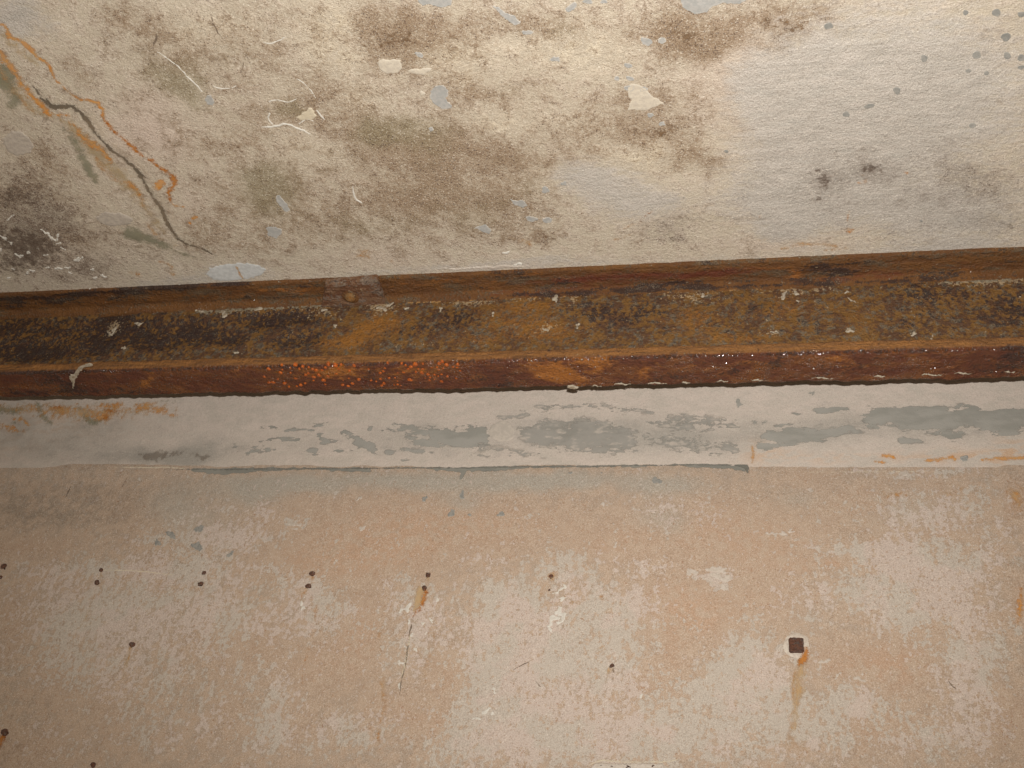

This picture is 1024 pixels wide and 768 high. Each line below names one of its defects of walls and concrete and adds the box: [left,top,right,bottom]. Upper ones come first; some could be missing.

peeling [158,52,236,106]
rust [0,23,183,207]
peeling [262,79,325,134]
crack [33,86,213,255]
leakage [0,226,60,267]
rust [263,360,461,388]
rust [0,403,174,432]
peeling [233,403,740,461]
peeling [752,403,1024,451]